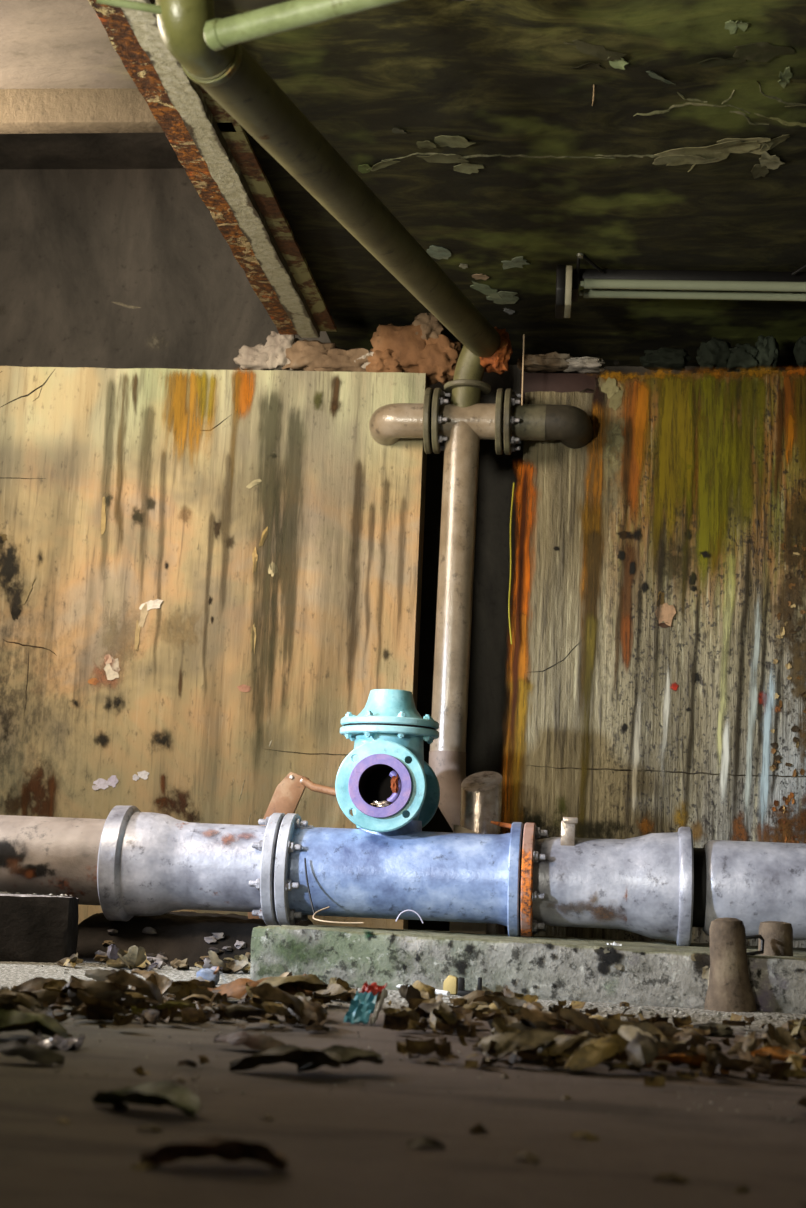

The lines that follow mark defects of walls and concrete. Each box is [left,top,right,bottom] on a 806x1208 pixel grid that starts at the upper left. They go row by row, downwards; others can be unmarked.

peeling [358,128,790,179]
spalling [233,313,462,385]
rust [168,372,213,452]
rust [234,370,255,416]
leakage [252,395,302,746]
leakage [348,463,362,688]
rust [578,368,806,844]
rust [501,463,535,834]
leakage [95,733,109,747]
leakage [105,697,124,711]
leakage [152,733,170,748]